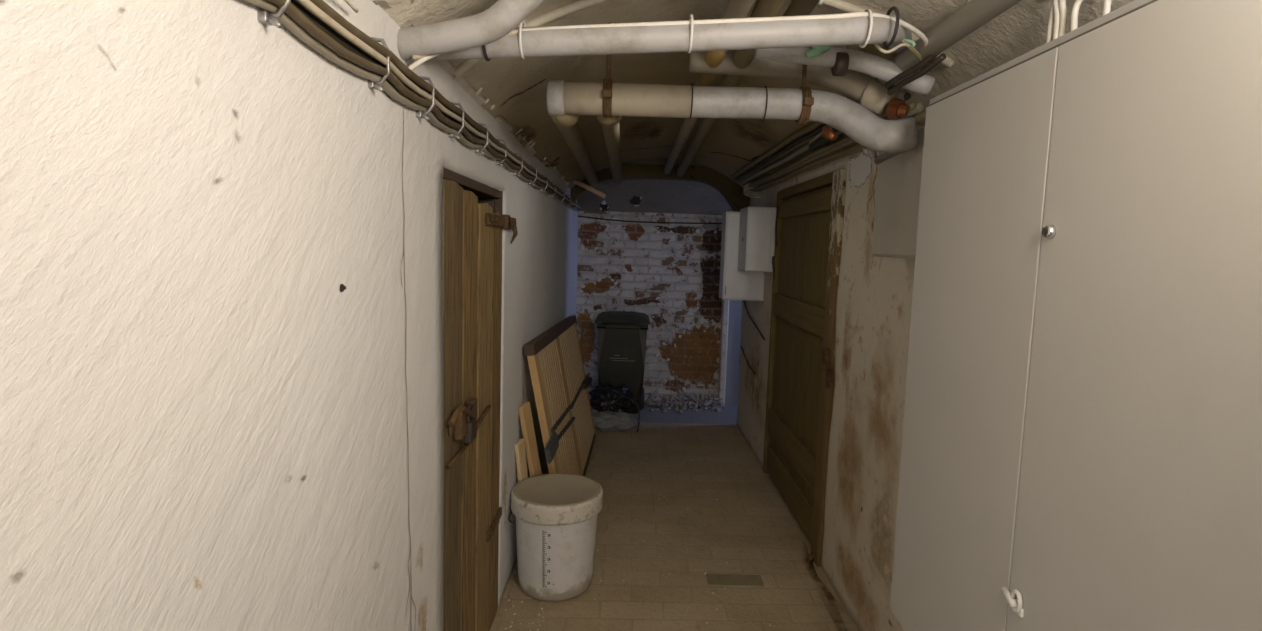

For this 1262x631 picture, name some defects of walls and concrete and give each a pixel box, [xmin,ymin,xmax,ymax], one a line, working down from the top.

flaking render [577,200,722,393]